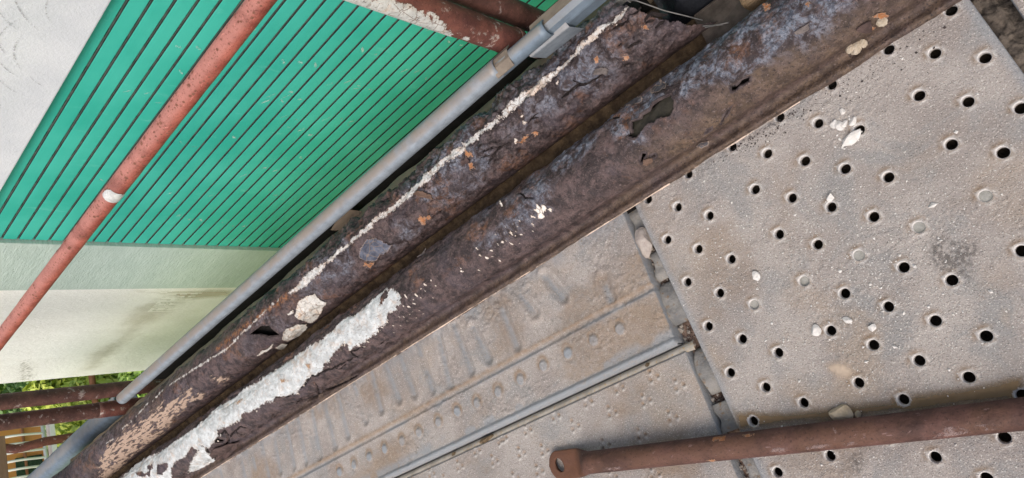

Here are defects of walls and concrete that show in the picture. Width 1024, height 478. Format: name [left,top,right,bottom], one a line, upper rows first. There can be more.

rust [460,151,475,171]
peeling [98,0,629,478]
rust [309,294,494,410]
rust [851,379,1020,414]
rust [737,411,830,437]
rust [201,442,239,478]